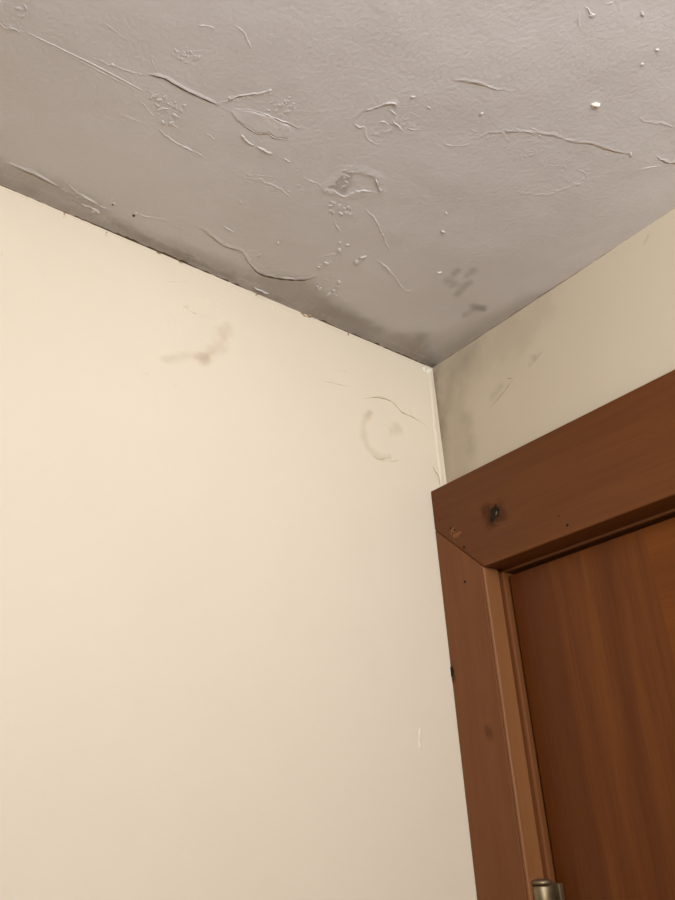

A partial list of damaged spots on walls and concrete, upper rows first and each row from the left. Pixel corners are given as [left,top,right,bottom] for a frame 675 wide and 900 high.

crack [149,59,272,106]
crack [445,126,675,181]
crack [36,200,317,296]
spalling [315,163,388,298]
crack [300,252,608,366]
crack [325,371,429,429]